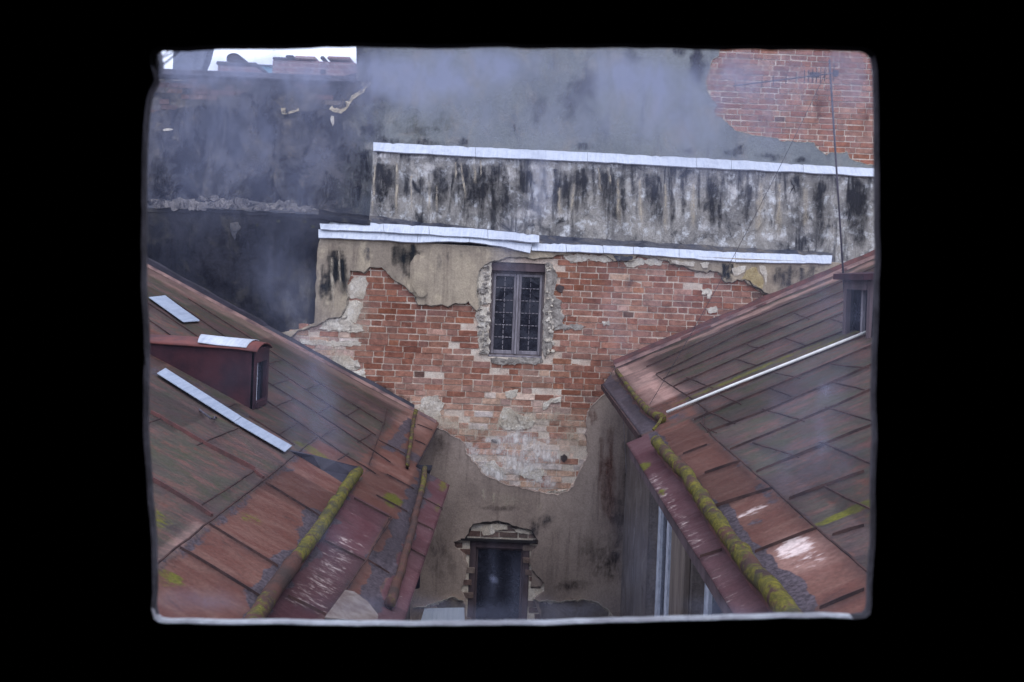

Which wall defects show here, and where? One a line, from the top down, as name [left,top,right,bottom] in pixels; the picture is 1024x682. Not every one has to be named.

flaking render [151,79,364,126]
flaking render [706,50,873,165]
leakage [362,126,762,226]
leakage [814,183,826,236]
leakage [846,181,867,241]
leakage [319,251,346,300]
leakage [392,244,416,266]
flaking render [289,252,768,496]
flaking render [413,521,614,620]